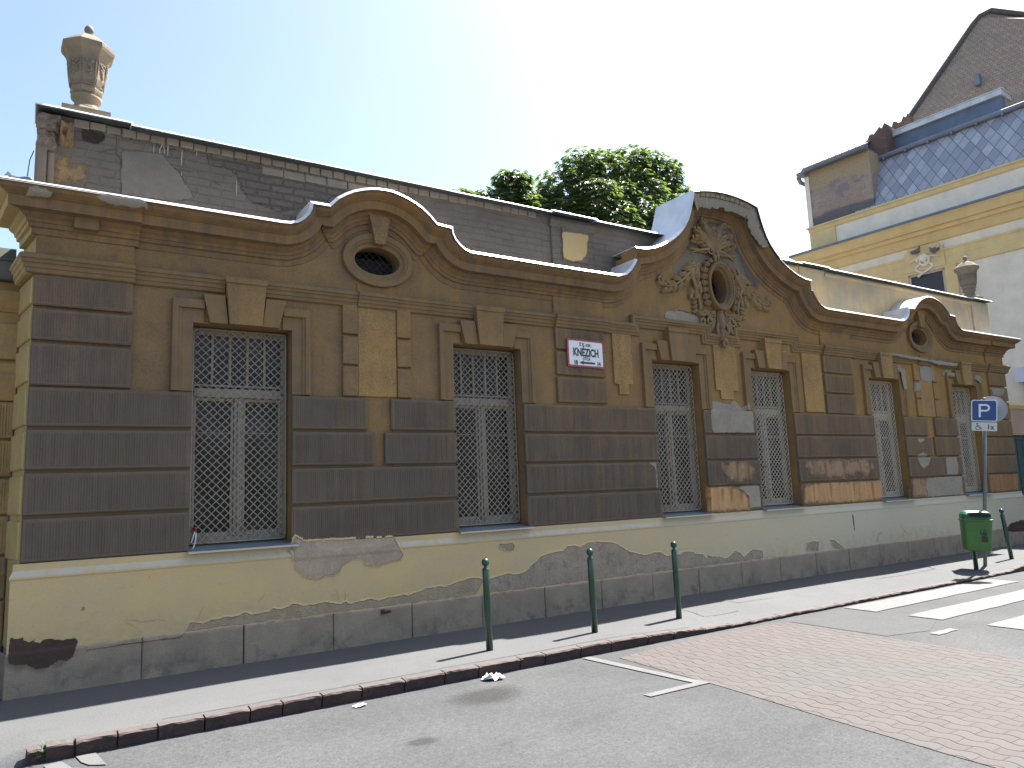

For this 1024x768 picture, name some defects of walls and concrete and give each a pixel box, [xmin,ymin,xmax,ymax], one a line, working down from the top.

flaking render [82,129,345,212]
peeling [706,460,755,513]
peeling [804,459,883,503]
flaking render [184,534,767,632]